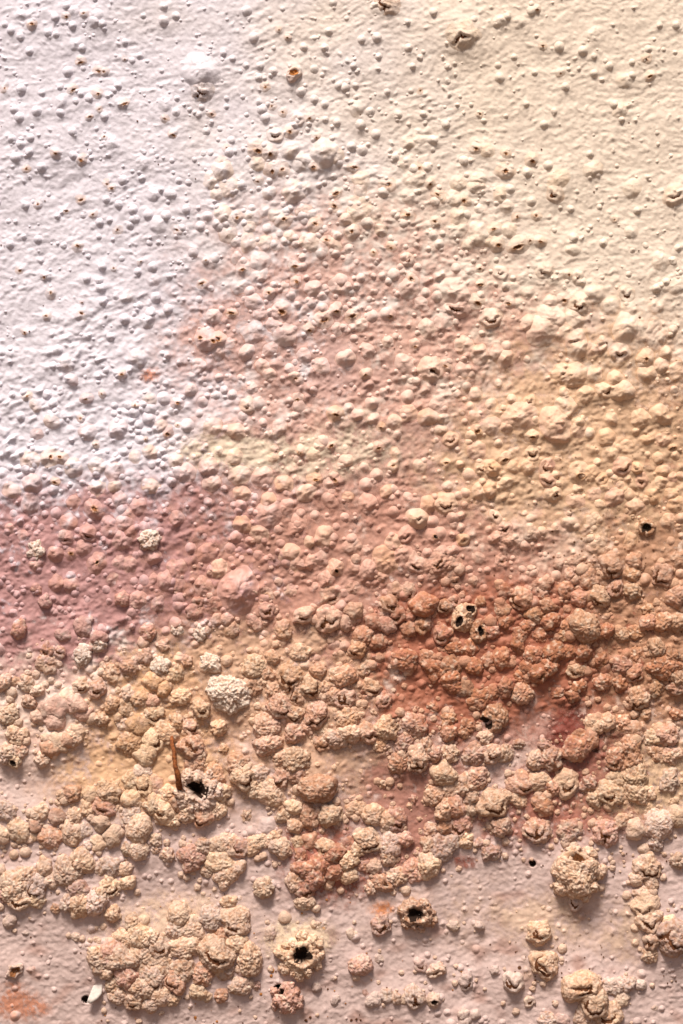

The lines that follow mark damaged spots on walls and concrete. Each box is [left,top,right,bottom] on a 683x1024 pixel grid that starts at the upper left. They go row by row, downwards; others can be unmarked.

leakage [0,256,683,1014]
corrosion [358,753,442,867]
corrosion [345,458,683,840]